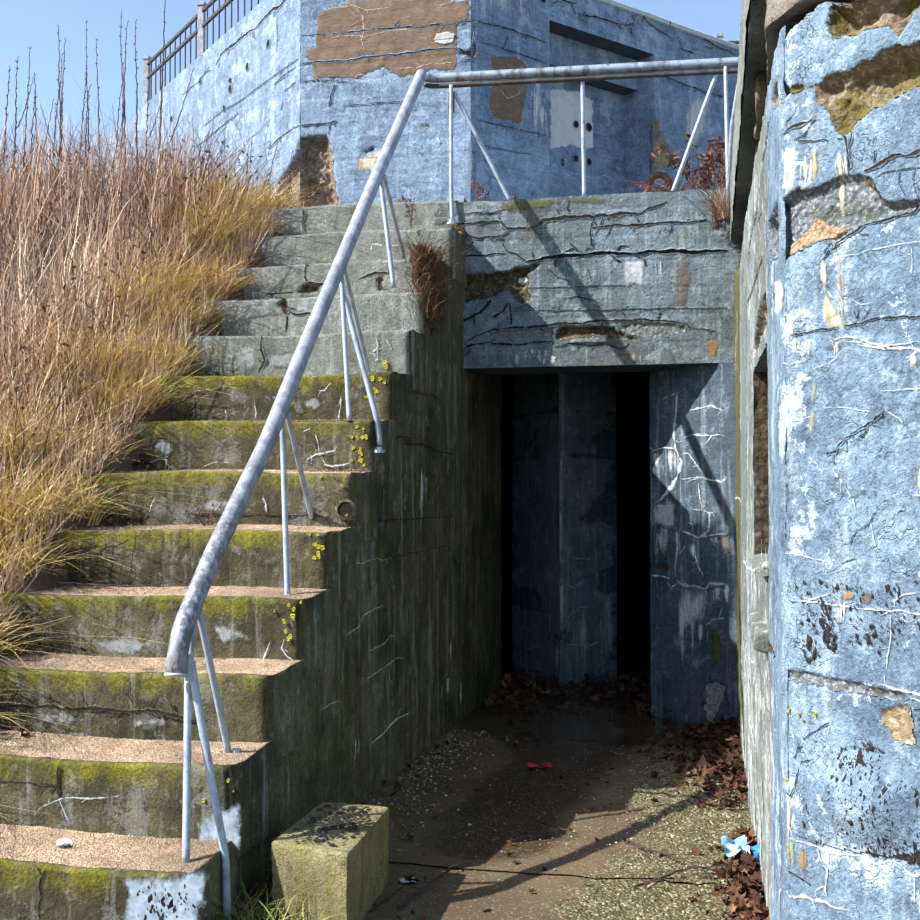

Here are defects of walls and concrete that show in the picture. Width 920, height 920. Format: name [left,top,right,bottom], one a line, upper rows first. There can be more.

peeling [305,0,477,80]
spalling [767,0,920,136]
spalling [279,137,339,208]
spalling [767,174,920,266]
spalling [465,263,540,303]
crack [454,199,762,355]
crack [783,299,920,371]
crack [649,385,920,720]
spalling [787,669,916,745]
crack [787,722,829,797]
peeling [126,874,204,920]
crack [786,827,920,910]